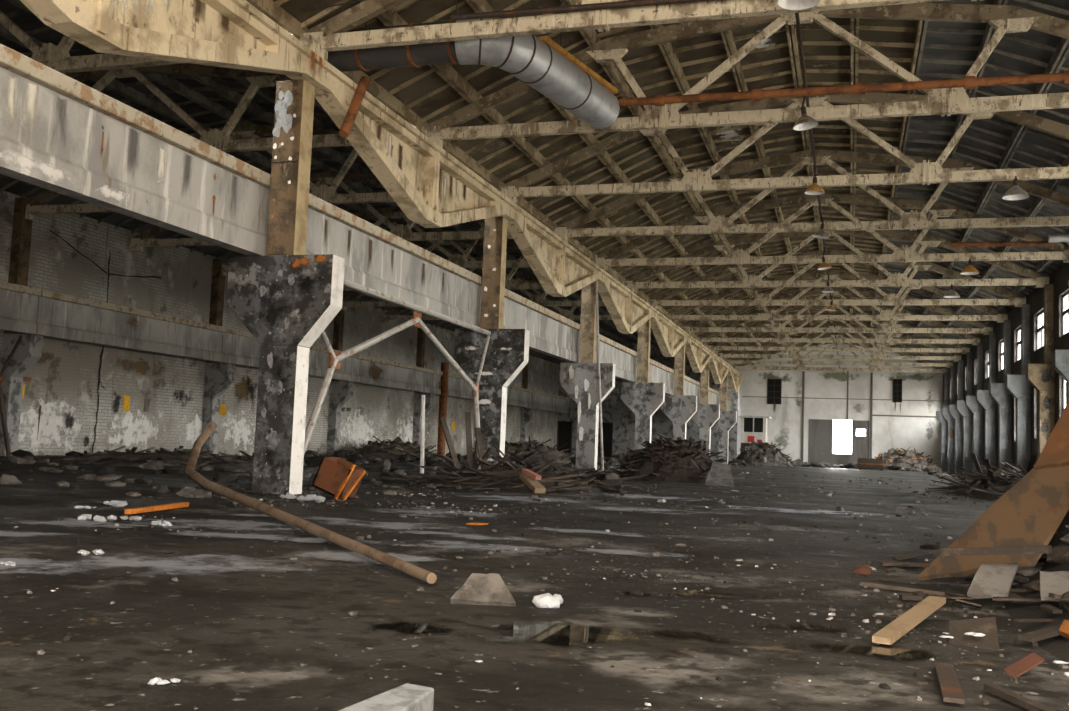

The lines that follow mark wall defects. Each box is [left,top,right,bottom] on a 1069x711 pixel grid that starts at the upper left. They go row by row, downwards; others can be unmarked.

damp [27,83,37,118]
damp [128,129,138,165]
peeling [272,90,296,161]
crack [92,346,105,453]
peeling [18,398,202,455]
peeling [217,407,266,455]
peeling [339,405,433,451]